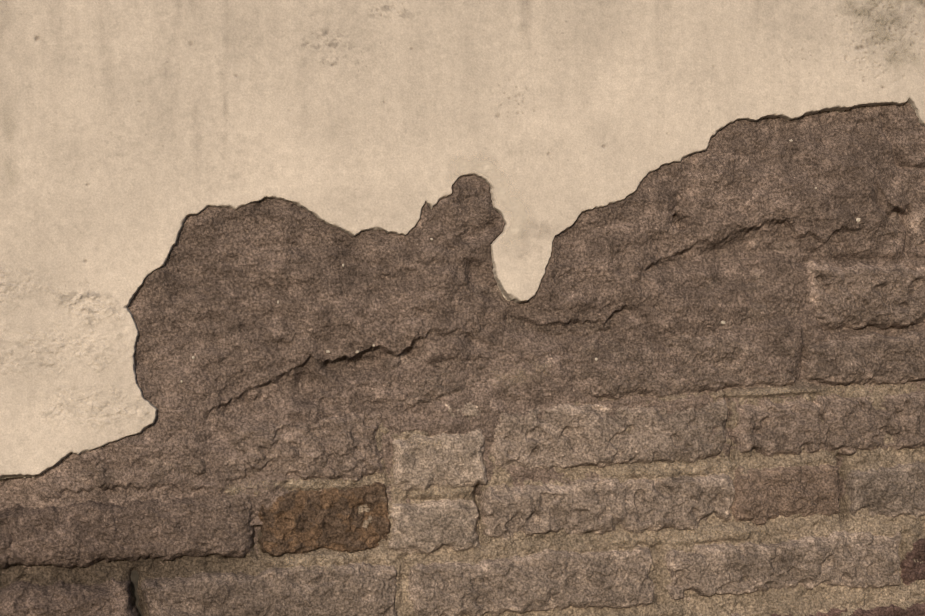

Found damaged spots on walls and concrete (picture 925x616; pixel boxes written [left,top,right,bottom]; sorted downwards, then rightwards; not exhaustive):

spalling [816,0,925,105]
flaking render [0,97,925,557]
spalling [0,578,134,616]
spalling [5,493,255,571]
spalling [407,546,655,616]
spalling [664,530,925,601]
spalling [806,603,925,616]